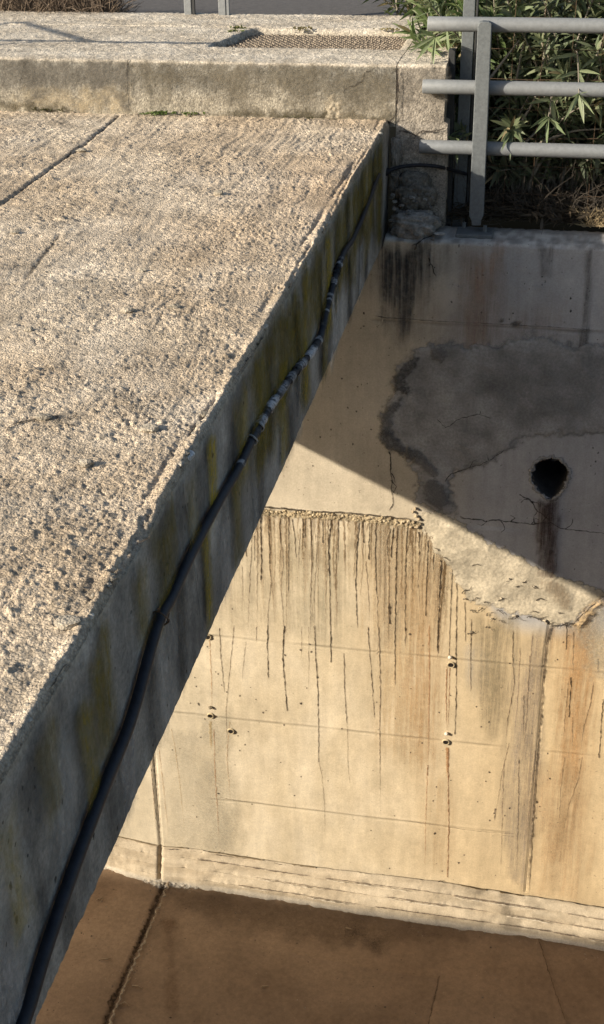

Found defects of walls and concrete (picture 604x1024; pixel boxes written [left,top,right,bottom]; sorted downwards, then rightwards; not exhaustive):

damp [189,146,481,774]
crack [462,494,601,533]
peeling [461,578,575,643]
damp [487,626,538,875]
damp [564,678,604,758]